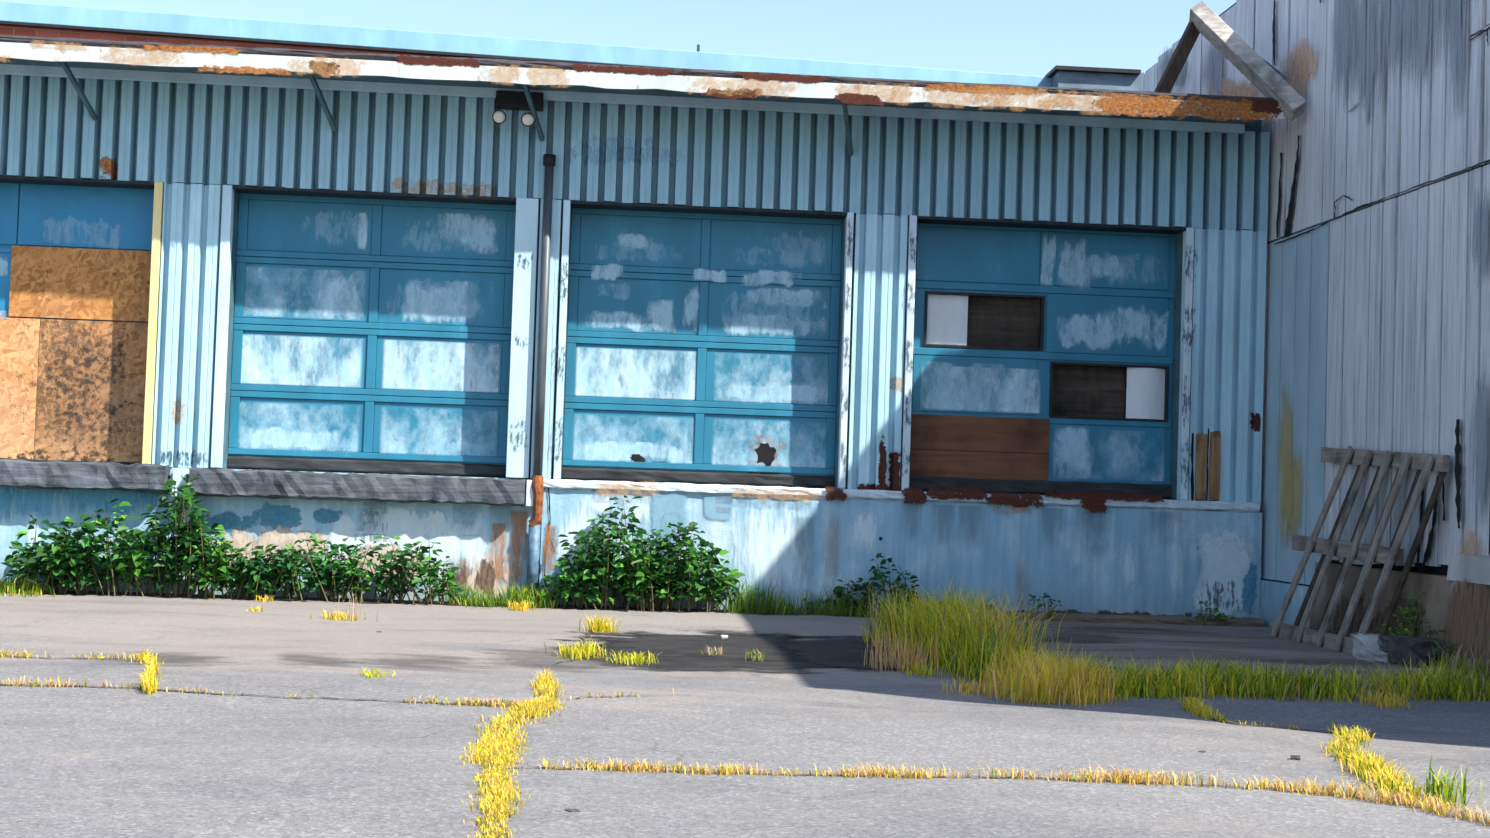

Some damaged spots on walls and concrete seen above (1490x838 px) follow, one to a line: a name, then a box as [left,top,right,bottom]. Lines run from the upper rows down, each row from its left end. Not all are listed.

corrosion [393,55,480,68]
corrosion [564,63,689,76]
corrosion [701,71,885,106]
water stain [1326,0,1469,125]
peeling [241,335,361,387]
peeling [383,340,498,392]
peeling [554,344,695,400]
peeling [551,415,692,463]
corrosion [825,436,901,502]
peeling [204,502,342,572]
water stain [555,630,934,674]
crack [0,630,638,838]